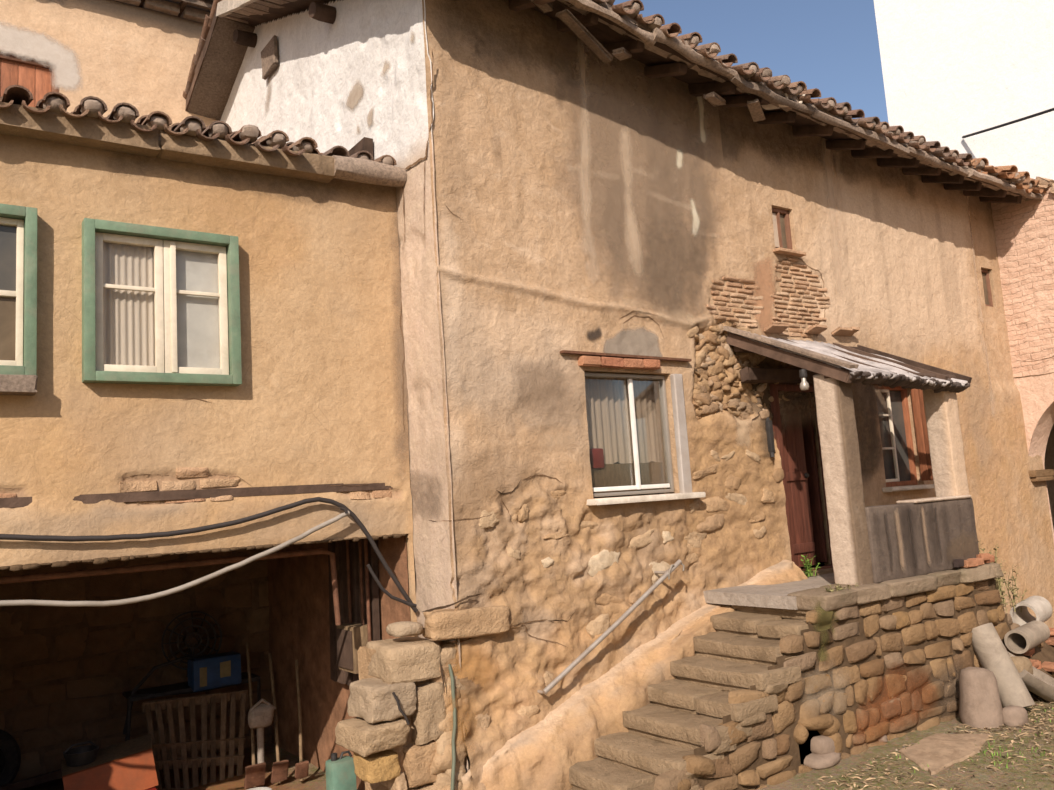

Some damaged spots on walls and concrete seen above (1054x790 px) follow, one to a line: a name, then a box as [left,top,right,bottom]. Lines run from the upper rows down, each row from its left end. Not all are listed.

leakage [557,36,855,314]
spalling [687,257,830,420]
crack [429,474,562,524]
crack [422,594,480,612]
crack [510,608,577,648]
crack [440,636,480,693]